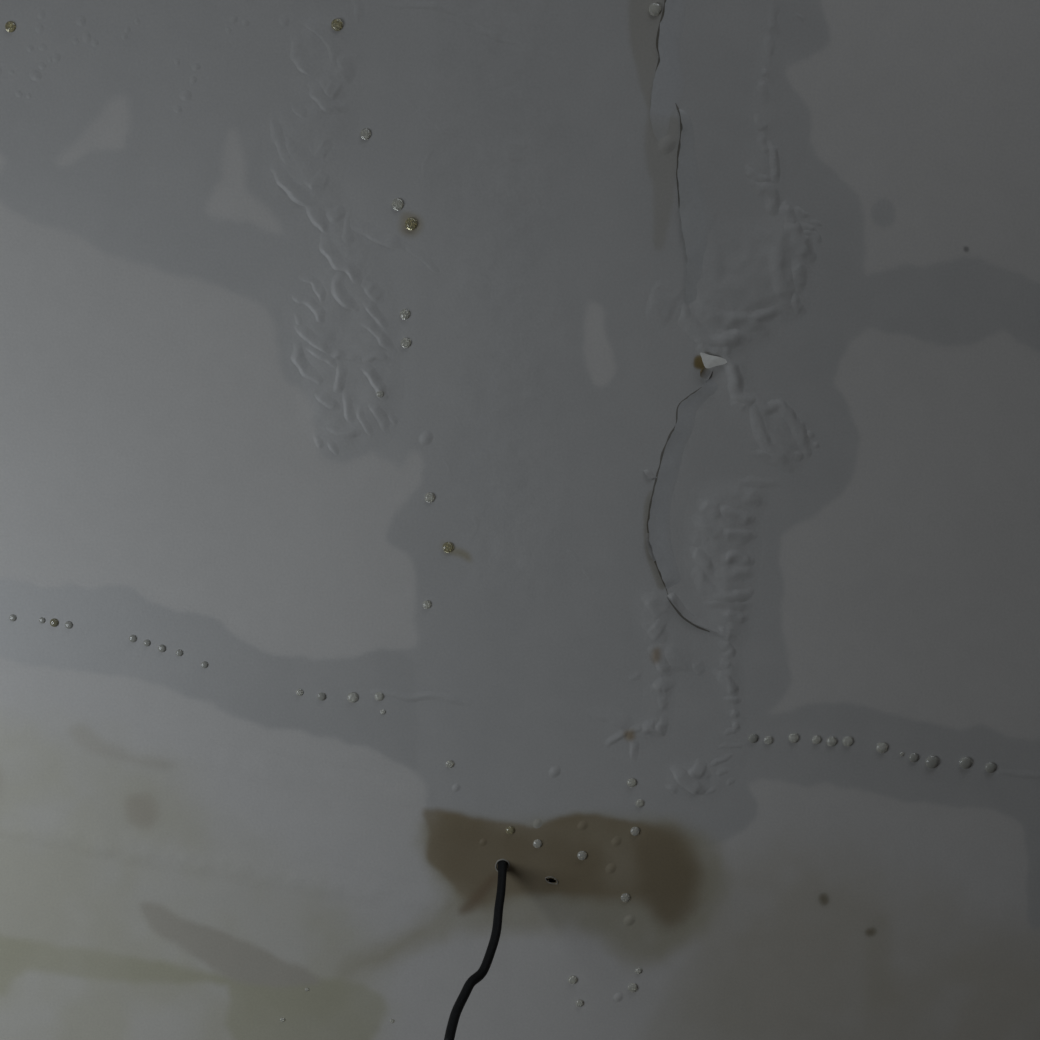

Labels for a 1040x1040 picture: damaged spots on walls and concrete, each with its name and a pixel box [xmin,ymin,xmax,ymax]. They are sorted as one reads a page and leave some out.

leakage [0,0,764,1040]
leakage [635,805,1040,1040]
leakage [668,0,1040,933]